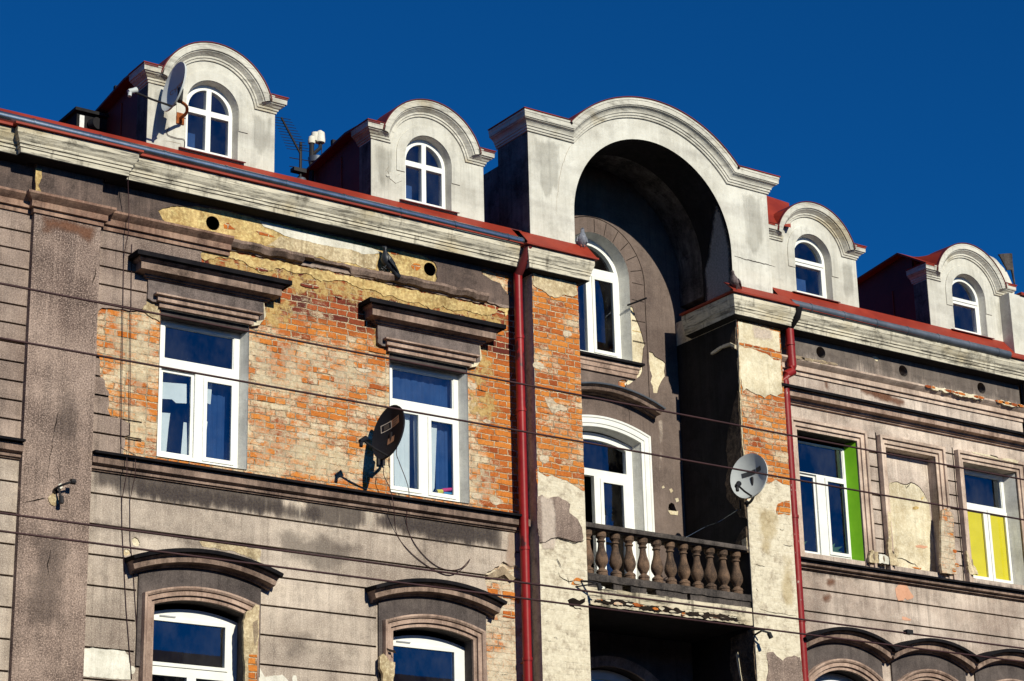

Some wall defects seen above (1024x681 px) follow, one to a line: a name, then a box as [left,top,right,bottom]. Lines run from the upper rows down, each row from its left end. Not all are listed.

spalling [97,206,519,514]
spalling [532,273,585,491]
peeling [619,307,665,393]
spalling [711,319,791,555]
flaking render [925,385,1024,407]
damp [99,472,516,566]
peeling [873,482,935,572]
spalling [568,598,757,681]